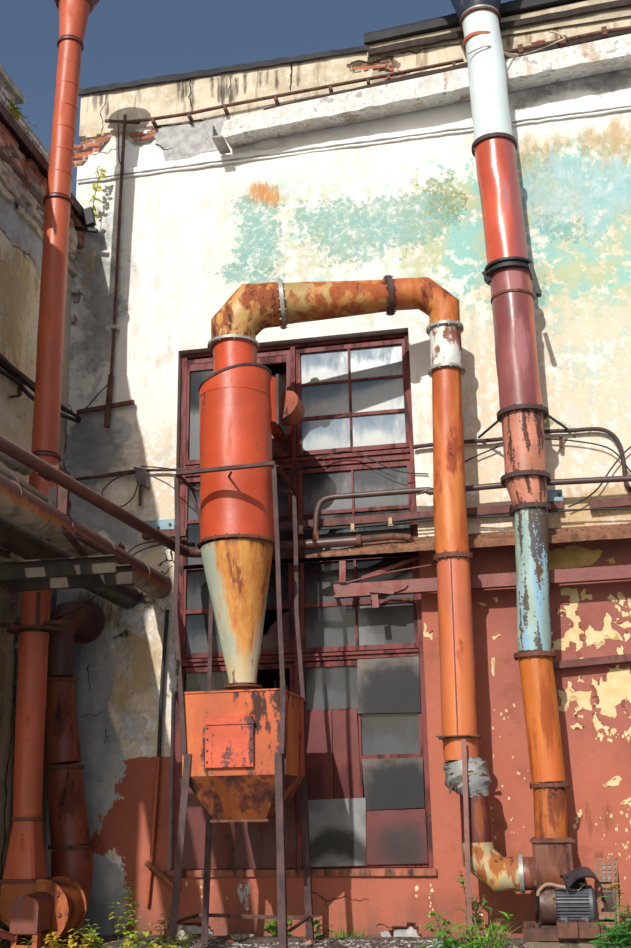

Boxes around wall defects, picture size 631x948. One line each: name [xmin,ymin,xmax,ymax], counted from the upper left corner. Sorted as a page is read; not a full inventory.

leakage [210,74,246,104]
spalling [73,134,113,167]
peeling [551,587,631,742]
peeling [602,776,622,787]
crack [312,891,364,910]